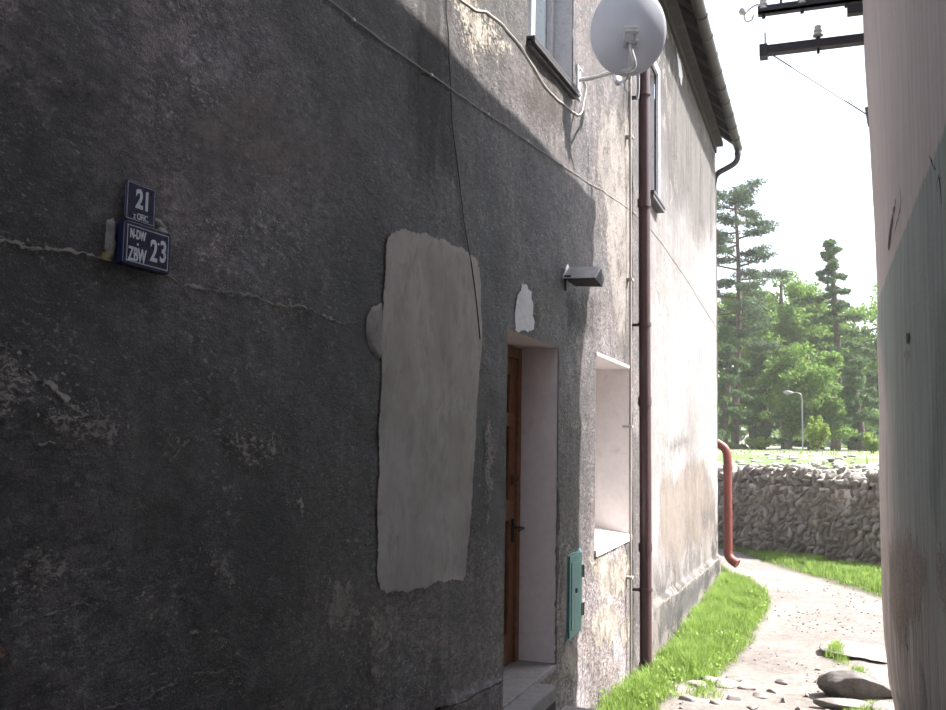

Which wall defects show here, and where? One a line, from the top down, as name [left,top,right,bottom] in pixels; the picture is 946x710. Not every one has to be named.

crack [0,233,102,268]
crack [165,274,361,325]
crack [0,342,133,468]